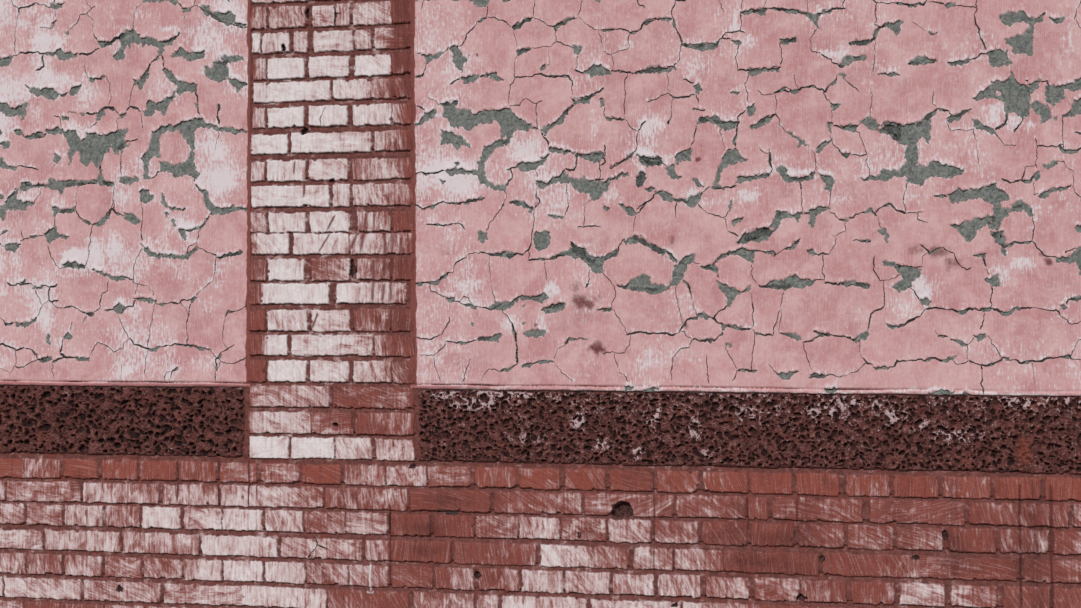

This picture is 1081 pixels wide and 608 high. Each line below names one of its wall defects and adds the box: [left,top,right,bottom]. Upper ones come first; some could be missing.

peeling [137,0,247,28]
crack [84,66,143,131]
crack [415,0,706,153]
crack [774,73,859,141]
peeling [0,20,248,295]
crack [414,192,564,231]
peeling [414,2,1081,380]
crack [0,186,247,380]
peeling [46,321,73,353]
crack [597,284,1081,397]
peeling [769,362,867,394]
peeling [928,385,971,395]